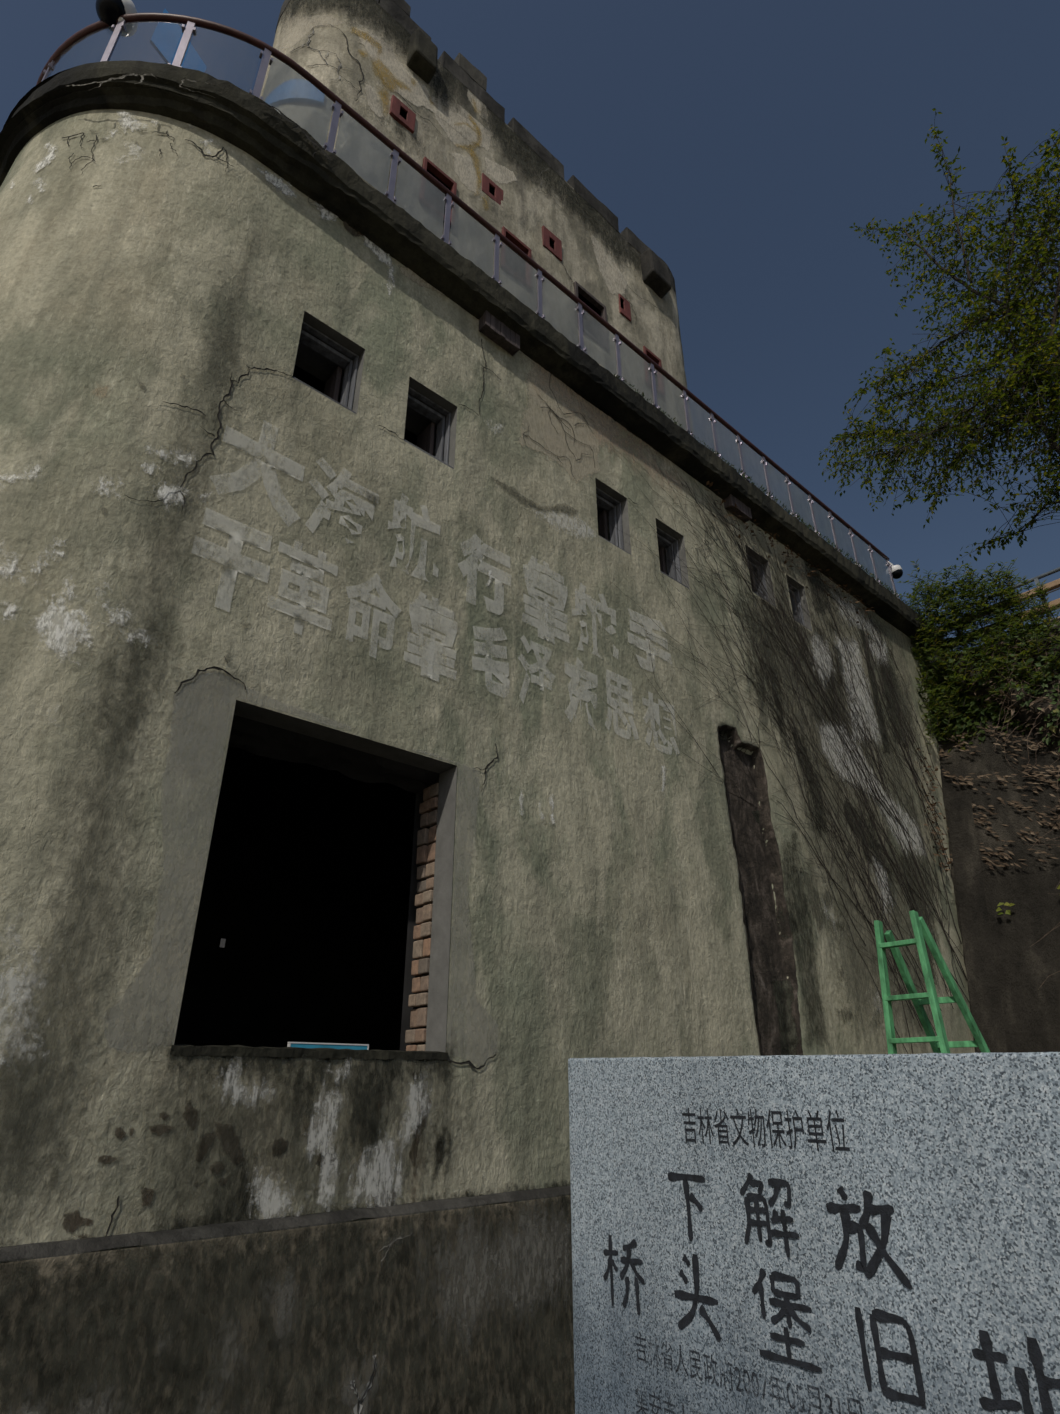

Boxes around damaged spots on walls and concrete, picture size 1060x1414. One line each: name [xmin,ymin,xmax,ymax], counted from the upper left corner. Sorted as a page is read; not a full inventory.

crack [290,24,442,135]
crack [62,132,101,187]
crack [157,131,234,172]
crack [126,365,293,510]
crack [174,656,246,694]
water stain [0,678,139,1219]
flaking render [98,1155,117,1164]
flaking render [115,1101,244,1185]
flaking render [409,1095,431,1166]
flaking render [63,1210,93,1239]
flaking render [141,1187,154,1207]
water stain [0,1052,575,1414]